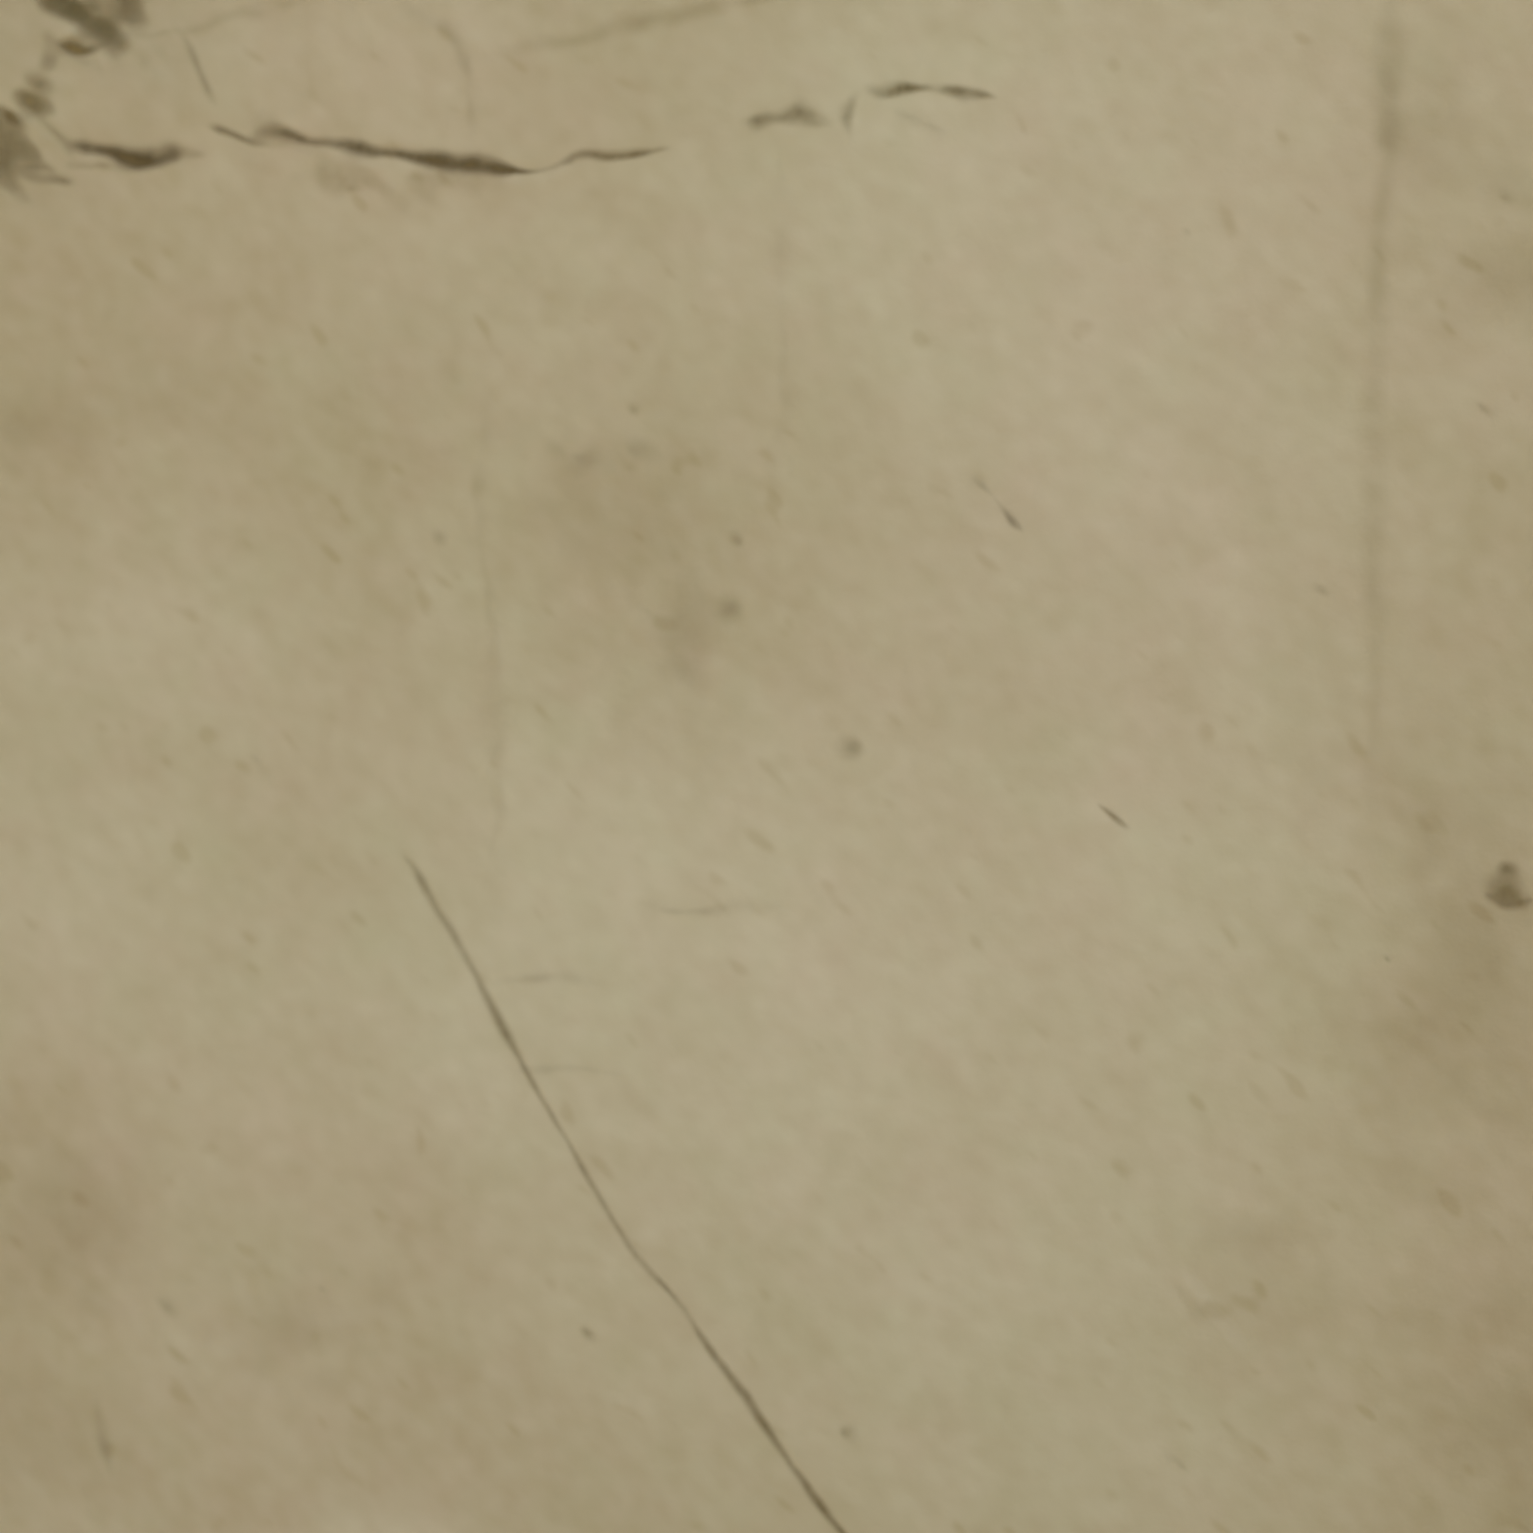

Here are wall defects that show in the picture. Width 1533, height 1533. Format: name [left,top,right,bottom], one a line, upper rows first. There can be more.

spalling [56,0,111,35]
spalling [63,43,93,55]
crack [897,85,961,93]
crack [284,132,304,141]
crack [82,145,176,168]
crack [345,143,528,174]